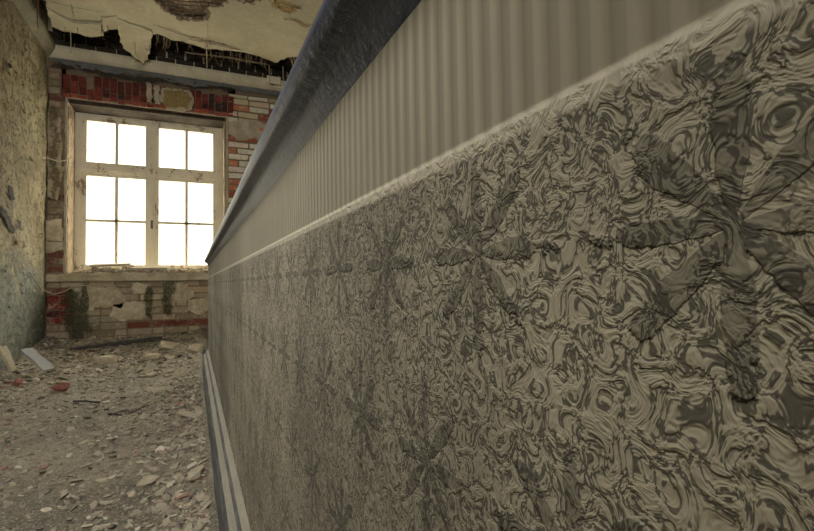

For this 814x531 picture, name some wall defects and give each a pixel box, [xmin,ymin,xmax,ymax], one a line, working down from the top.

spalling [154,0,261,50]
flaking render [0,0,208,340]
flaking render [228,89,279,208]